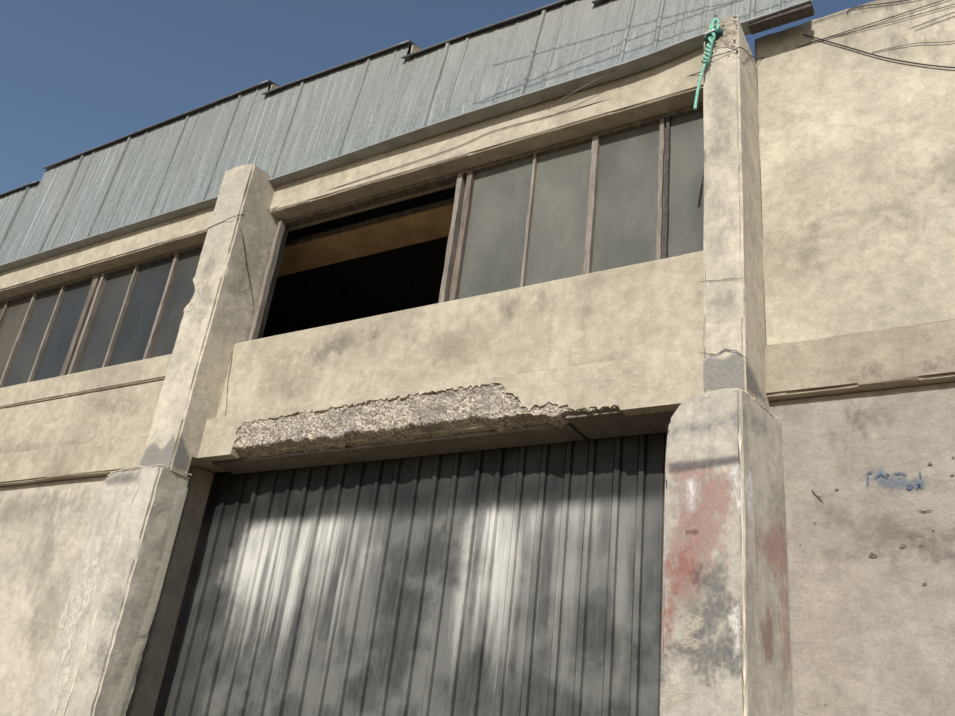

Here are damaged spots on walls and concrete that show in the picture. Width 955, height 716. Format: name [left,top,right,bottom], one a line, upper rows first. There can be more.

spalling [705,14,749,53]
crack [238,223,253,298]
spalling [234,383,599,459]